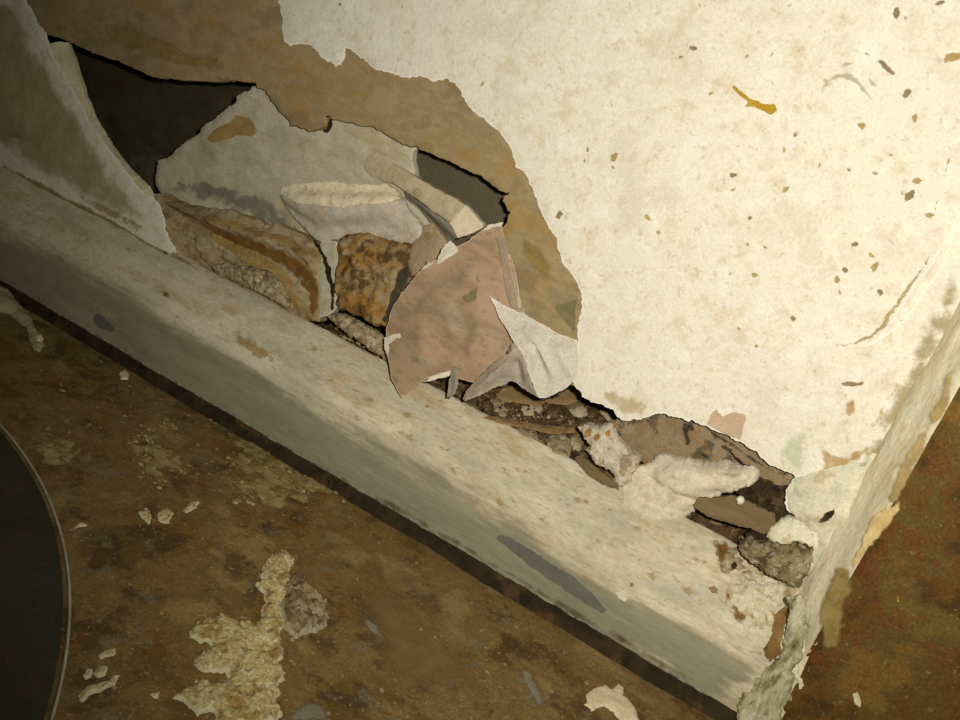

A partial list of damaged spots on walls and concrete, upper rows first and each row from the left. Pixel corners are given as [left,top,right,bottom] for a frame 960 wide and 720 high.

spalling [47,35,257,158]
flaking render [111,222,200,270]
spalling [310,309,351,328]
crack [843,259,928,346]
peeling [708,410,746,439]
water stain [887,317,950,422]
peeling [930,374,952,423]
peeling [575,455,619,490]
peeling [497,535,606,612]
peeling [821,433,927,648]
flaking render [709,514,816,720]